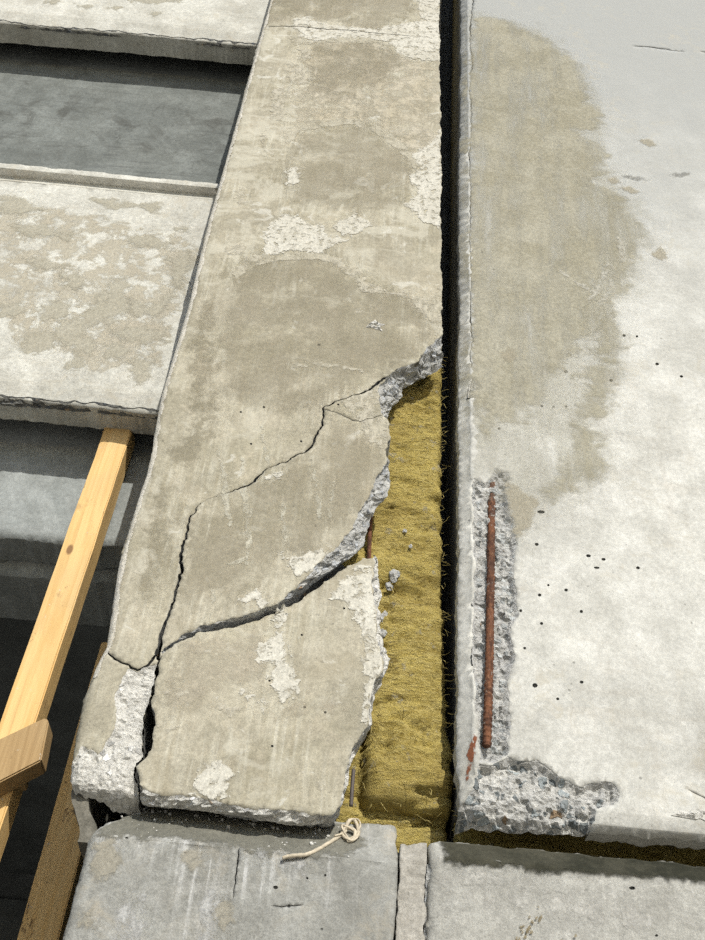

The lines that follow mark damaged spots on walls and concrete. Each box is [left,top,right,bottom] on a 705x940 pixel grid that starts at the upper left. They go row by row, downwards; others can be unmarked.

crack [229,377,385,493]
spalling [341,334,444,445]
water stain [459,18,637,535]
spalling [70,555,390,826]
crack [108,458,390,812]
spalling [454,469,620,837]